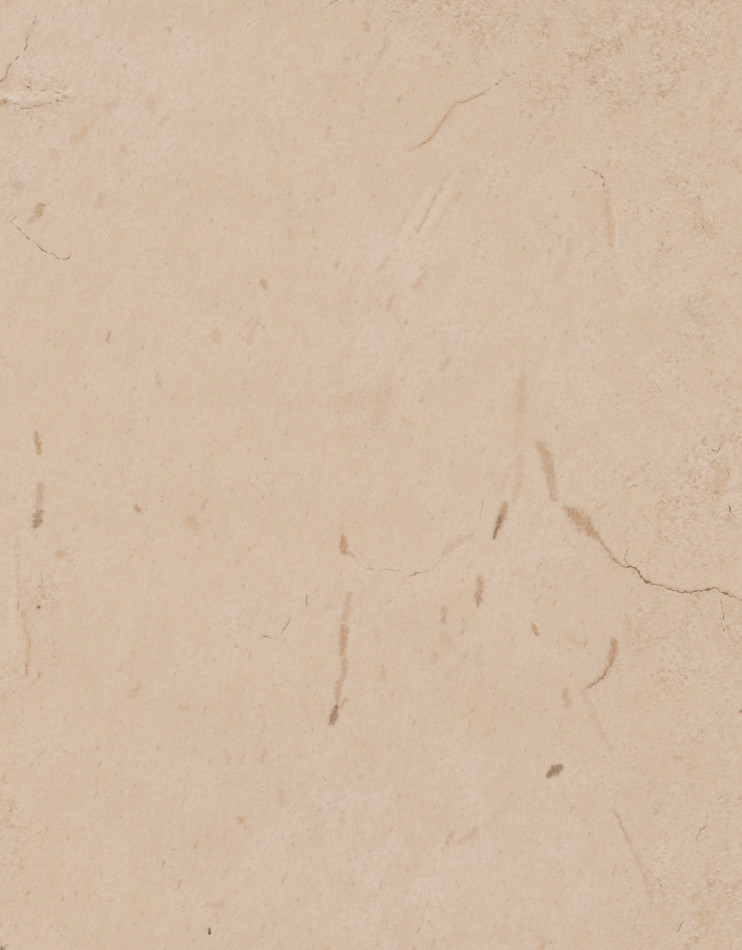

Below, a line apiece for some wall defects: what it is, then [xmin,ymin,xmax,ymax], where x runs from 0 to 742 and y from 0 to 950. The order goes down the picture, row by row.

crack [601,542,742,630]